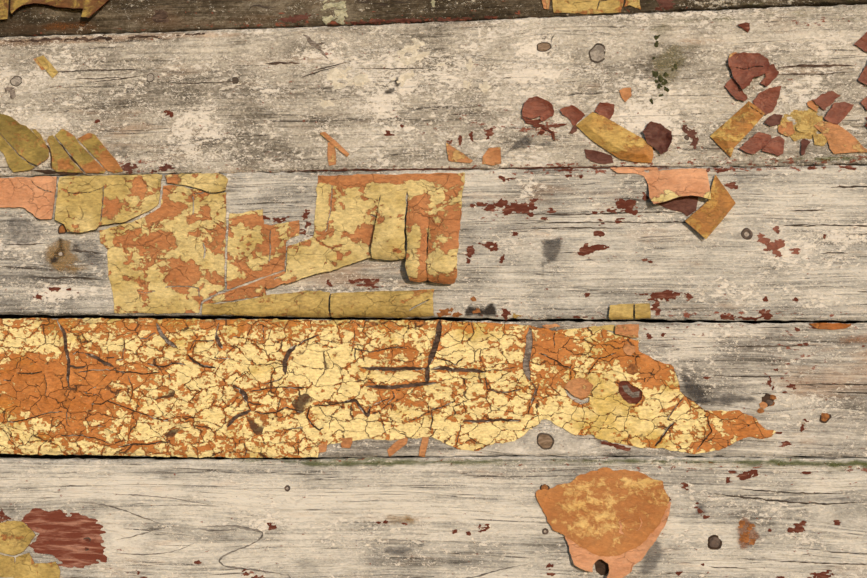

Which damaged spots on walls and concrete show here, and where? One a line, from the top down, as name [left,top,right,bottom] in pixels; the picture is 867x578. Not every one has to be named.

peeling [542,0,641,14]
peeling [854,32,867,52]
peeling [710,52,867,157]
peeling [522,87,738,256]
crack [10,267,106,281]
crack [67,248,104,256]
peeling [0,114,792,458]
crack [7,323,264,447]
peeling [0,508,60,578]
peeling [536,467,671,578]